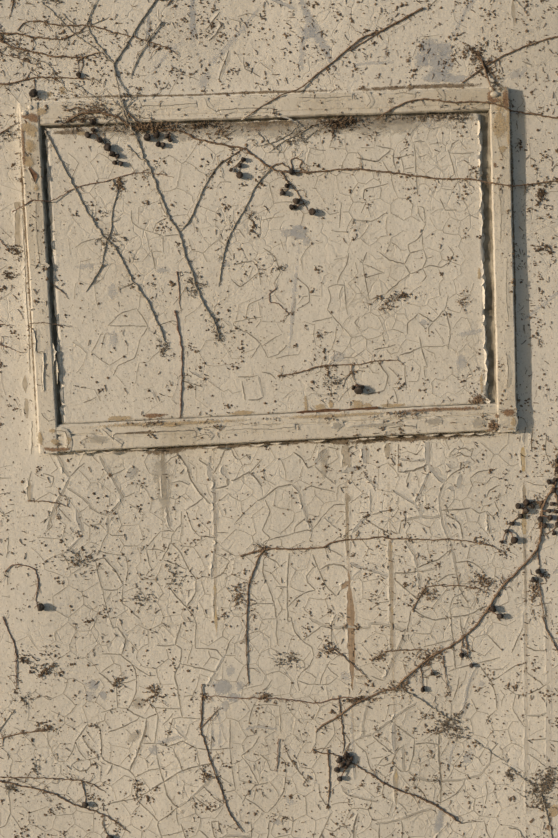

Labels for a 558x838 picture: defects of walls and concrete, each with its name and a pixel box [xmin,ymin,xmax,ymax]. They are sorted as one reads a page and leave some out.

crack [394,65,425,98]
crack [0,184,50,392]
crack [67,119,479,415]
crack [495,182,512,322]
crack [528,143,558,275]
crack [503,355,512,388]
crack [0,370,558,838]